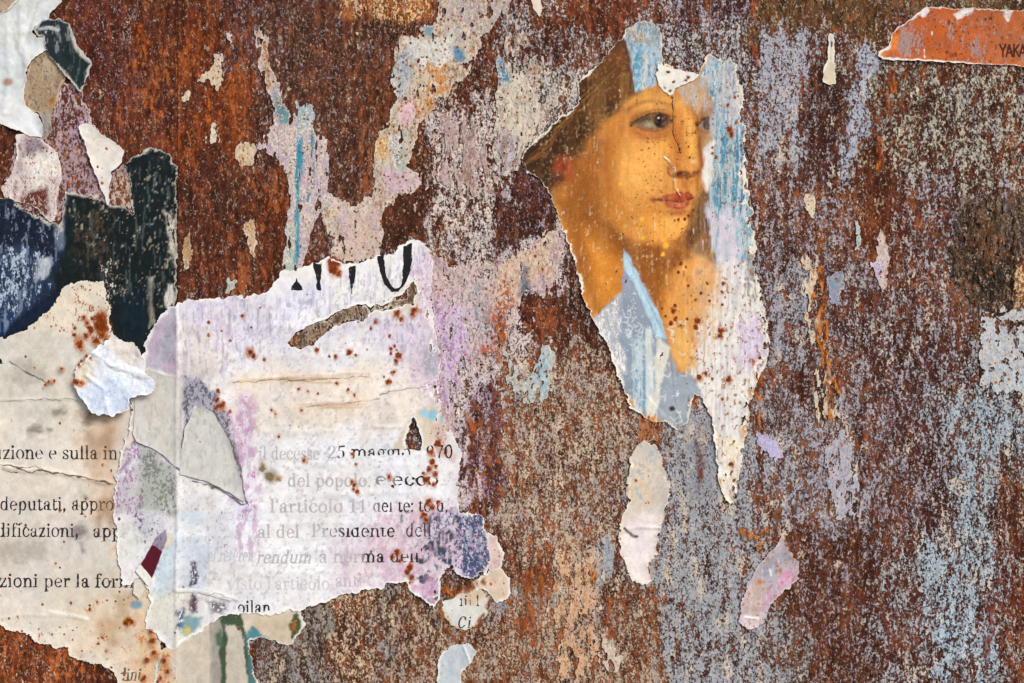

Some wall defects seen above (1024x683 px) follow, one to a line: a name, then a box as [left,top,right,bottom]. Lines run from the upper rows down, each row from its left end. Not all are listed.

corrosion [129,23,150,68]
peeling [1,82,133,221]
peeling [235,0,564,271]
peeling [182,232,193,269]
peeling [225,278,237,294]
corrosion [948,194,1020,318]
peeling [290,211,565,437]
corrosion [495,313,506,363]
corrosion [812,266,840,419]
peeling [756,433,784,462]
corrosion [441,579,486,597]
corrosion [520,564,550,629]